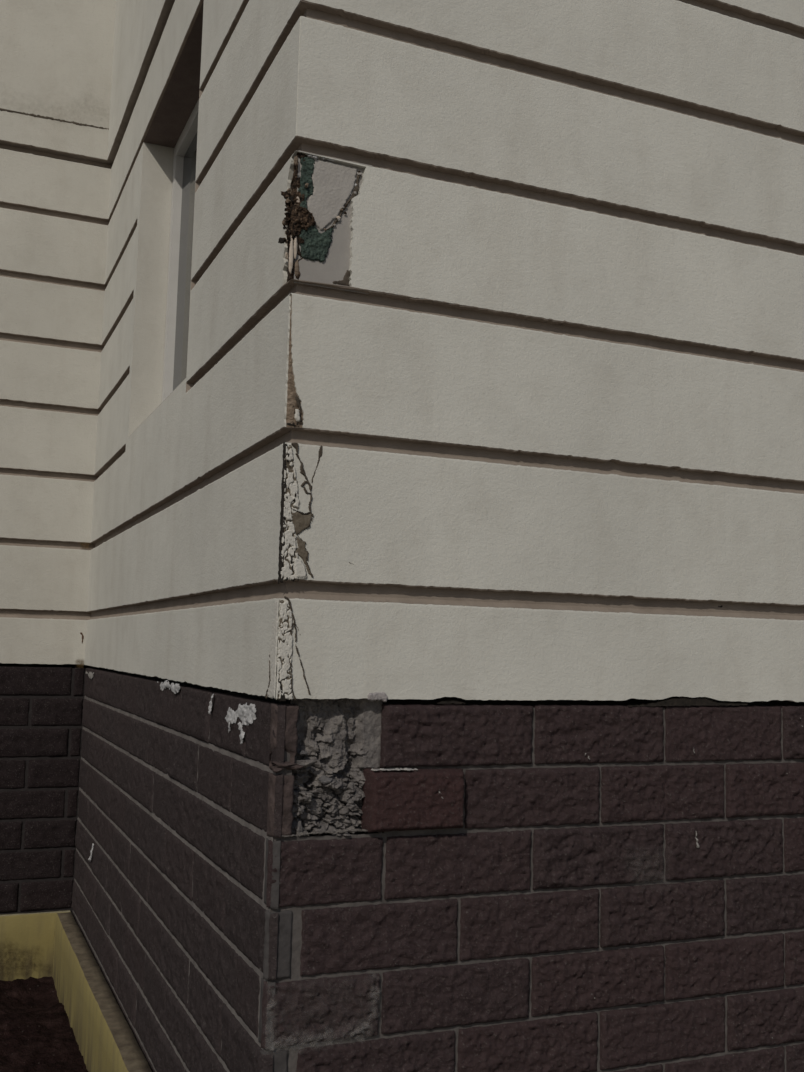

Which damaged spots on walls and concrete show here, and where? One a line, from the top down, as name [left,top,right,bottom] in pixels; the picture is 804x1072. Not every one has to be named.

spalling [278,150,372,428]
peeling [278,442,313,584]
crack [291,443,323,514]
crack [284,596,311,701]
spalling [265,600,383,838]